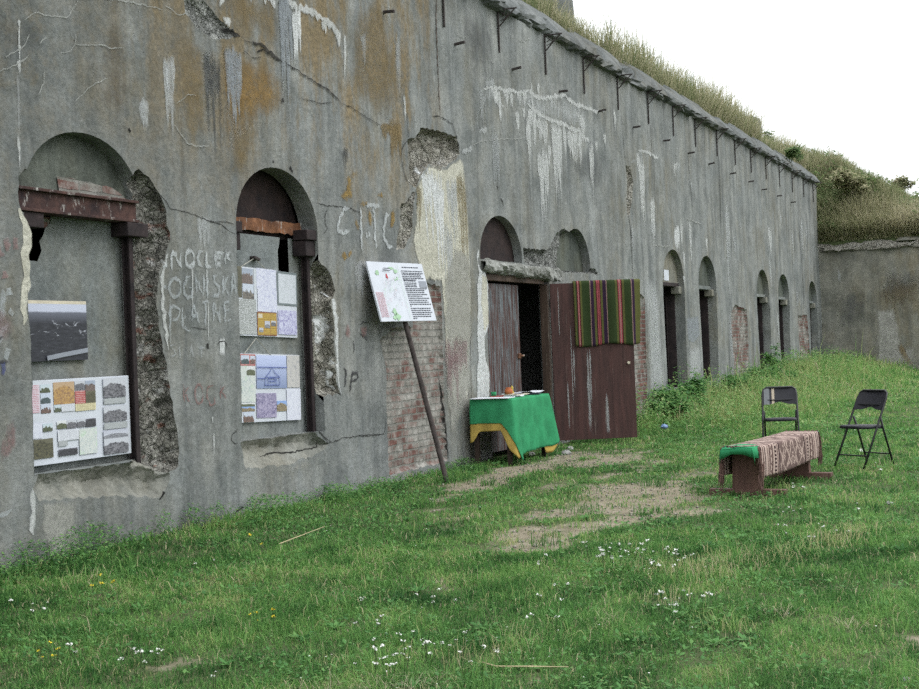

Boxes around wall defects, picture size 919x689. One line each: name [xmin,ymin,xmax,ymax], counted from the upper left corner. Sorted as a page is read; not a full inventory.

spalling [184,0,234,40]
crack [220,28,382,126]
leakage [264,0,346,89]
spalling [396,127,460,250]
leakage [483,80,616,211]
peeling [481,275,489,330]
flaking render [380,252,471,475]
crack [260,427,386,457]